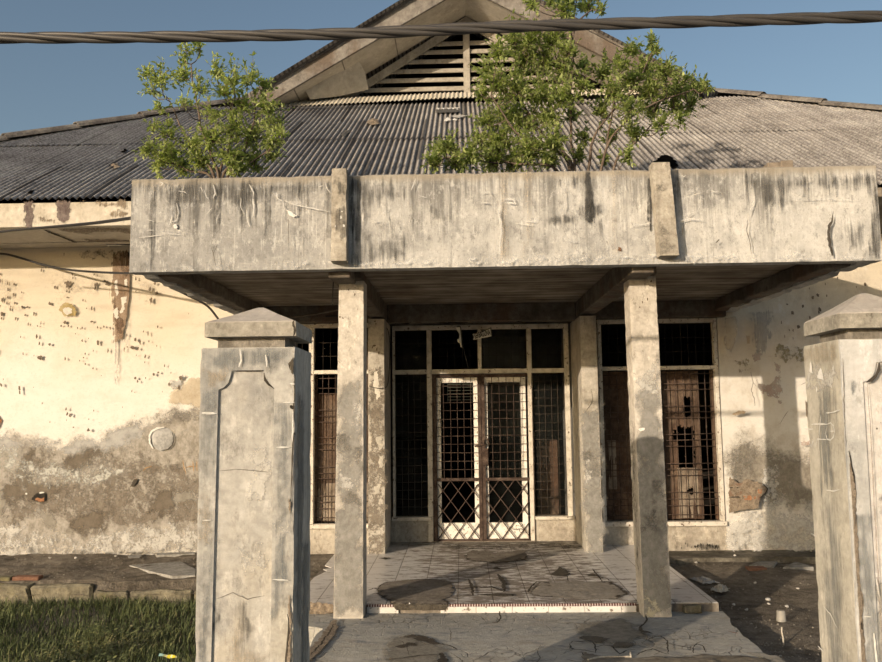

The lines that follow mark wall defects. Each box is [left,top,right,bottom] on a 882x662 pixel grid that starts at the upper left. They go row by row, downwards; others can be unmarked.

water stain [240,185,328,226]
water stain [481,191,516,264]
water stain [551,172,602,229]
water stain [630,178,666,232]
crack [826,214,834,256]
water stain [843,176,880,259]
water stain [681,310,836,552]
water stain [0,375,215,556]
spalling [728,477,768,513]
water stain [271,538,286,617]
crack [371,631,463,662]
crack [568,614,706,662]